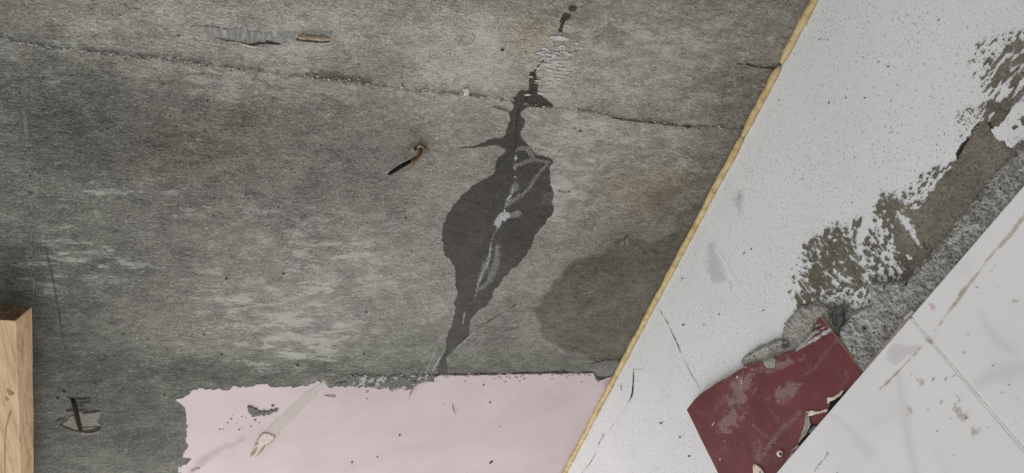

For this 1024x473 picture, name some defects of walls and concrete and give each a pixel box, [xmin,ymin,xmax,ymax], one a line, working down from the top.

damp [558,5,577,33]
damp [438,60,554,376]
damp [537,227,690,363]
peeling [787,28,1024,312]
spalling [687,317,864,473]